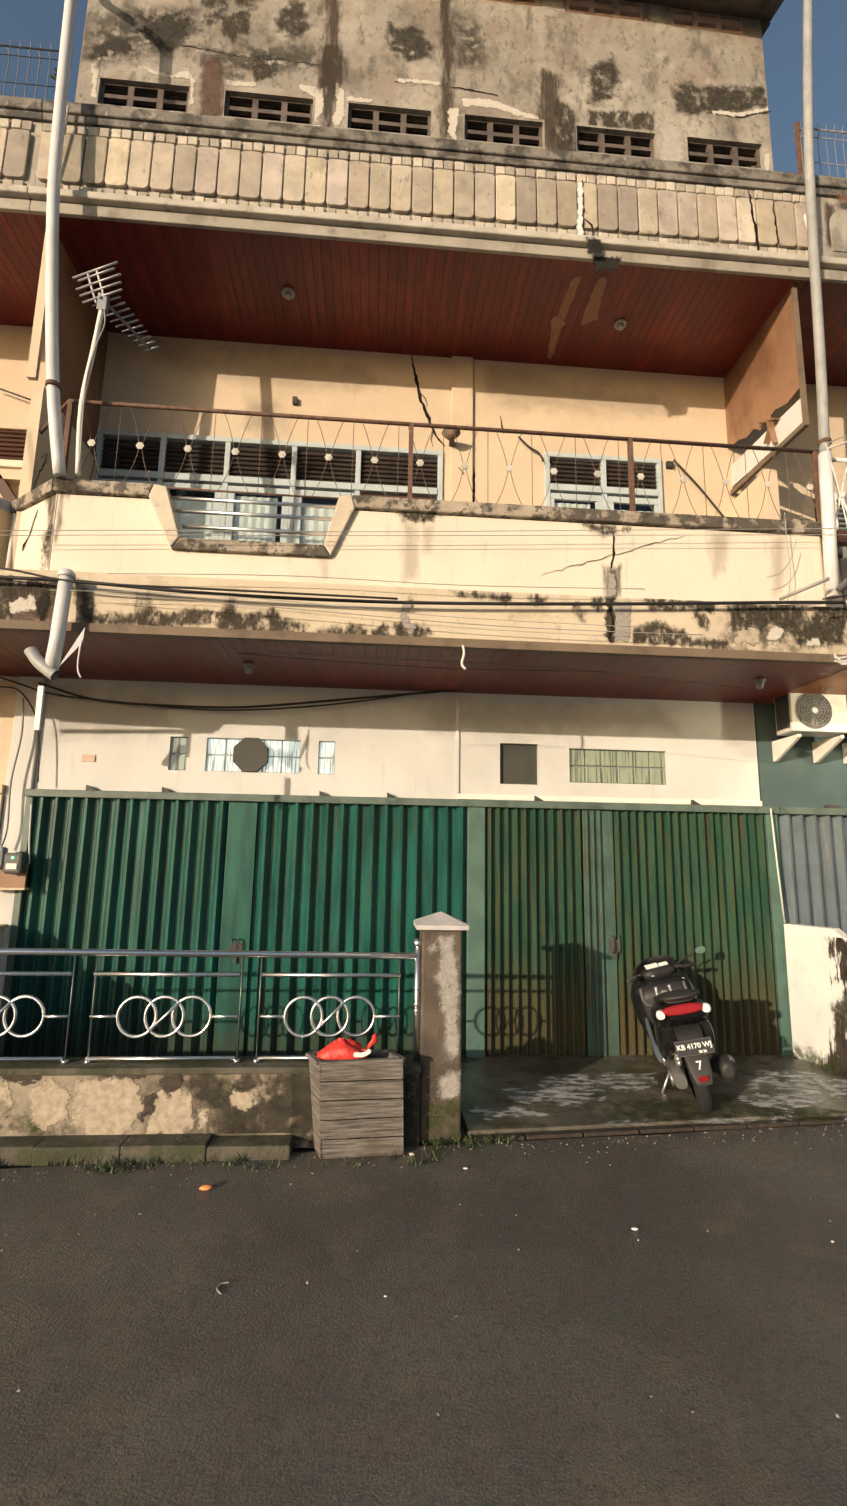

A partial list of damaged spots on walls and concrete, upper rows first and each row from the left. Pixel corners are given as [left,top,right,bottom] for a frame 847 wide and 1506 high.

water stain [87,0,345,127]
water stain [387,0,485,137]
water stain [539,59,654,151]
water stain [674,81,767,115]
crack [411,355,475,502]
water stain [51,582,432,637]
water stain [458,591,546,602]
crack [544,523,683,643]
water stain [633,598,728,649]
water stain [704,937,847,1124]
peeling [0,1075,214,1135]
peeling [229,1089,258,1112]